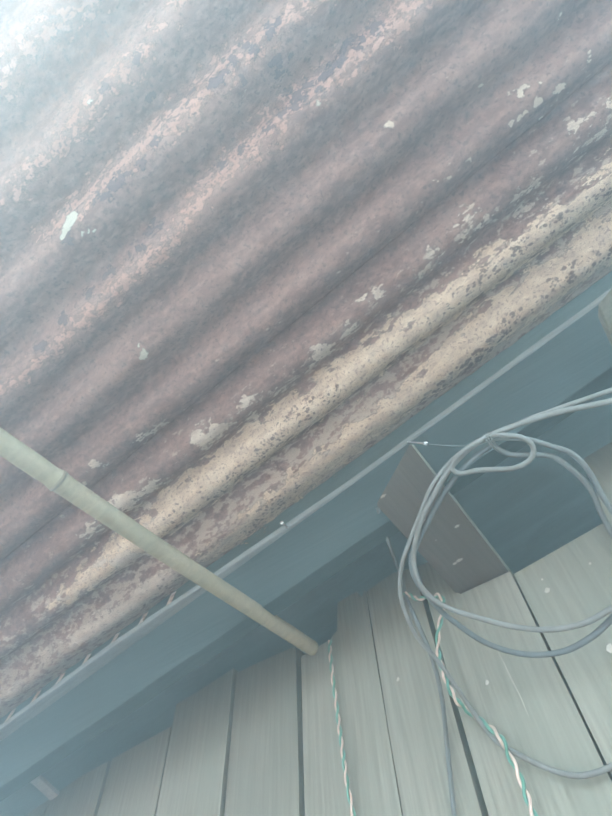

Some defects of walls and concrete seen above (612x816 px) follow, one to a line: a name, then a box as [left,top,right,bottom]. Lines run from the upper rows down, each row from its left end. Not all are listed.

peeling [507,81,542,98]
peeling [563,97,612,158]
peeling [59,211,78,240]
peeling [412,175,548,283]
peeling [305,319,359,373]
peeling [355,284,386,302]
damp [130,147,612,562]
spalling [431,237,612,397]
spalling [189,382,339,500]
peeling [107,477,173,512]
damp [45,532,145,610]
peeling [35,568,184,664]